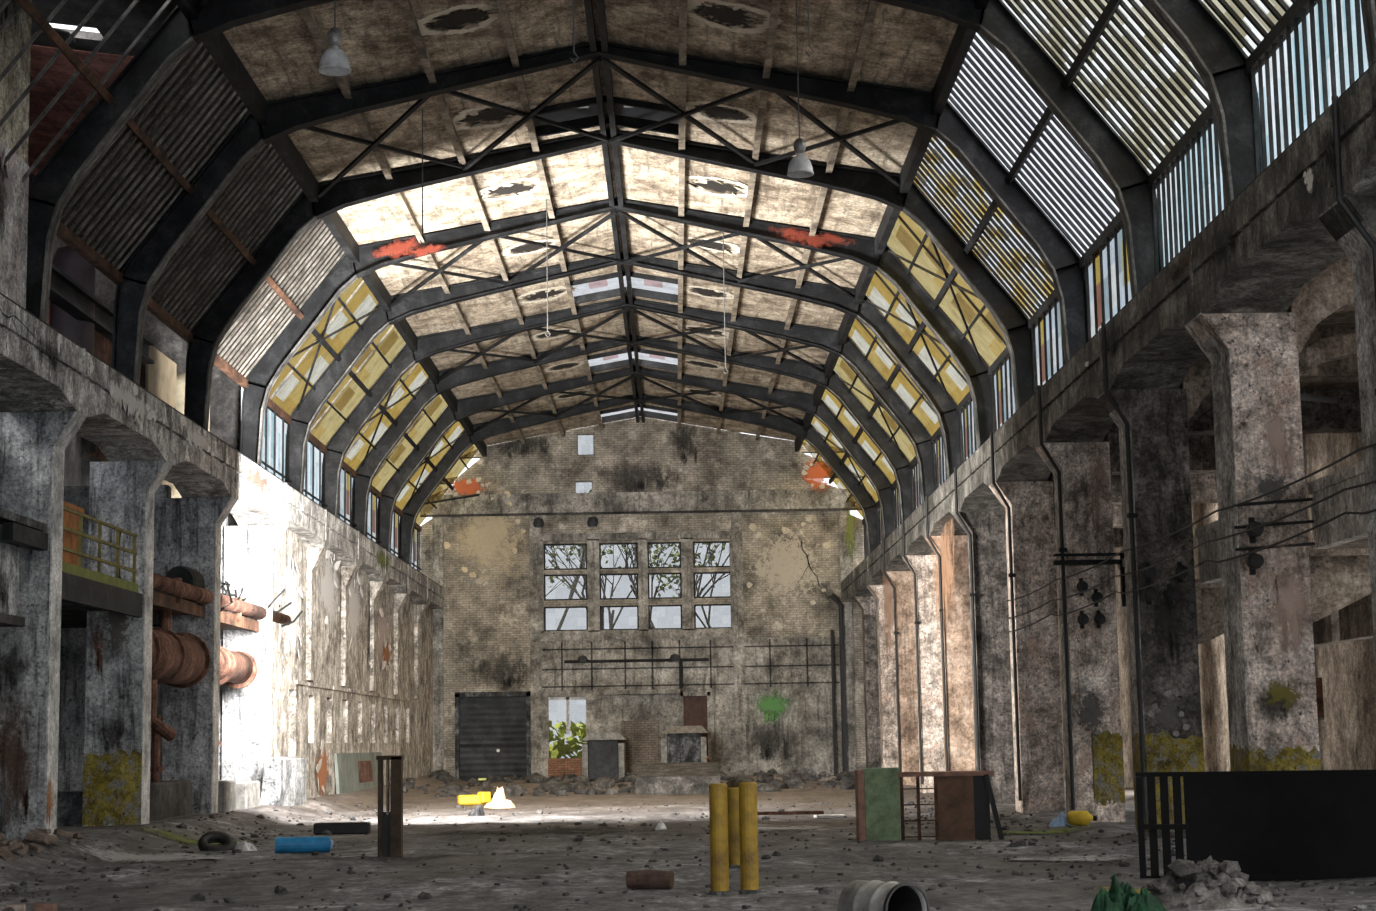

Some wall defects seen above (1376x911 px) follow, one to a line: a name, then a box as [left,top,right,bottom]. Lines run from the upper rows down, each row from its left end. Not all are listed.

corrosion [0,698,31,821]
leakage [1259,692,1292,720]